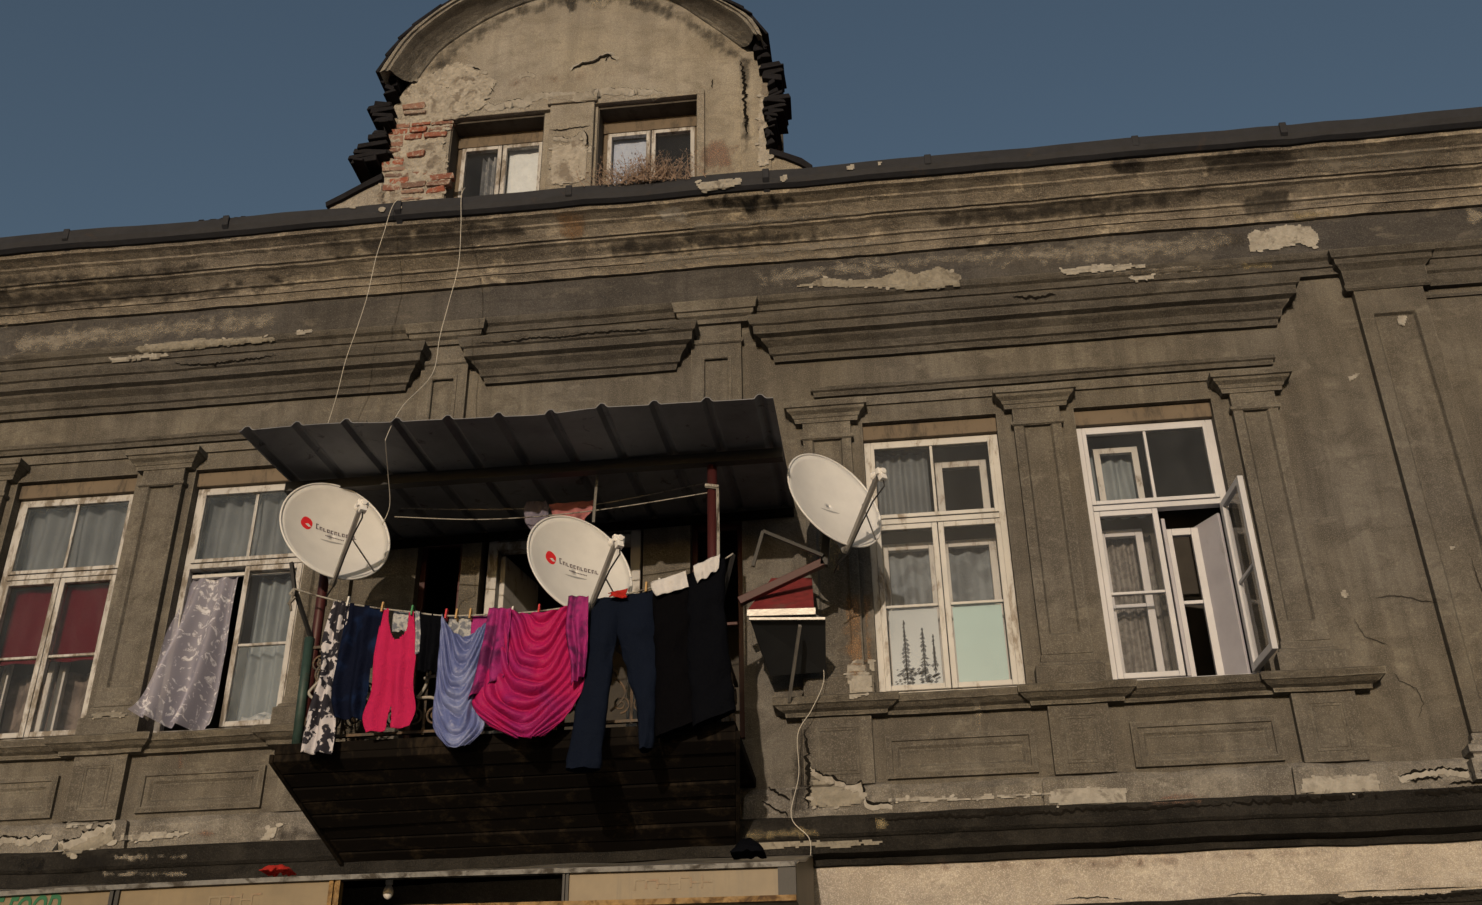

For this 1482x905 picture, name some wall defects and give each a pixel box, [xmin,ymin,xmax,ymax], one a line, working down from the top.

spalling [376,62,497,212]
crack [421,52,663,153]
water stain [1204,145,1449,174]
water stain [0,264,272,355]
water stain [329,224,523,257]
flaking render [797,266,961,291]
water stain [612,195,1266,283]
peeling [1059,263,1156,282]
flaking render [1247,224,1319,252]
crack [1354,595,1434,718]
crack [762,734,1482,821]
crack [0,819,180,852]